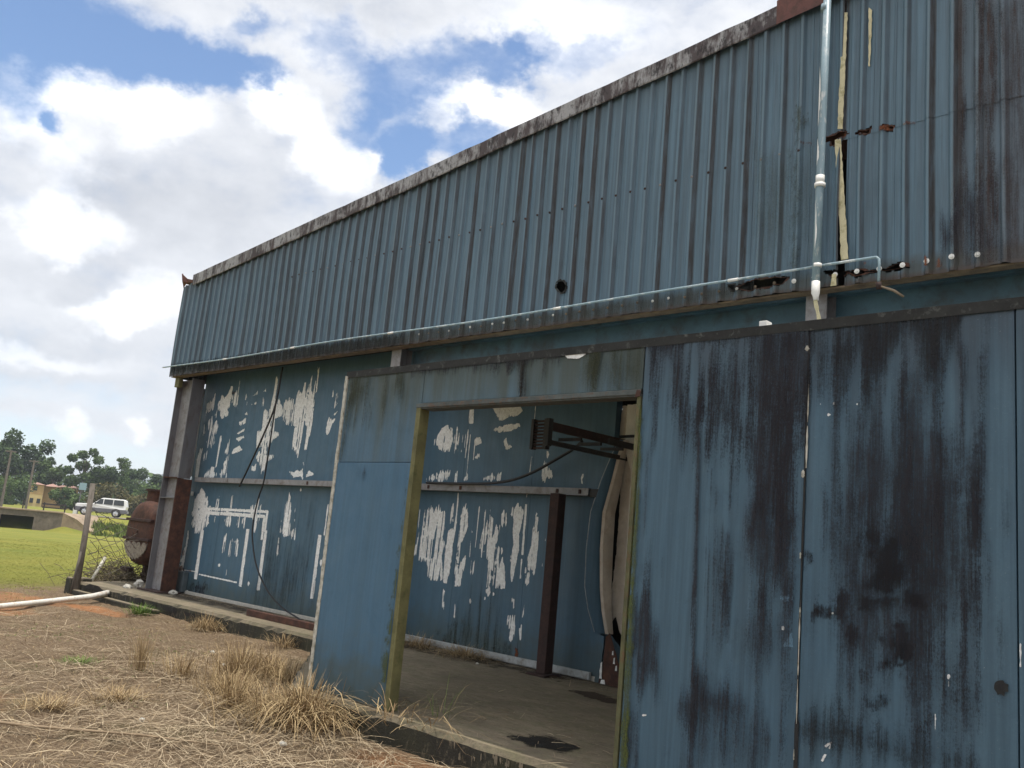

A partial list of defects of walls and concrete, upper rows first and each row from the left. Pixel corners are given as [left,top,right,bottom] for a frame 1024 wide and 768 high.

peeling [179,369,319,590]
peeling [310,506,328,599]
peeling [326,393,338,435]
peeling [414,406,546,642]
peeling [529,451,553,483]
damp [585,315,986,768]